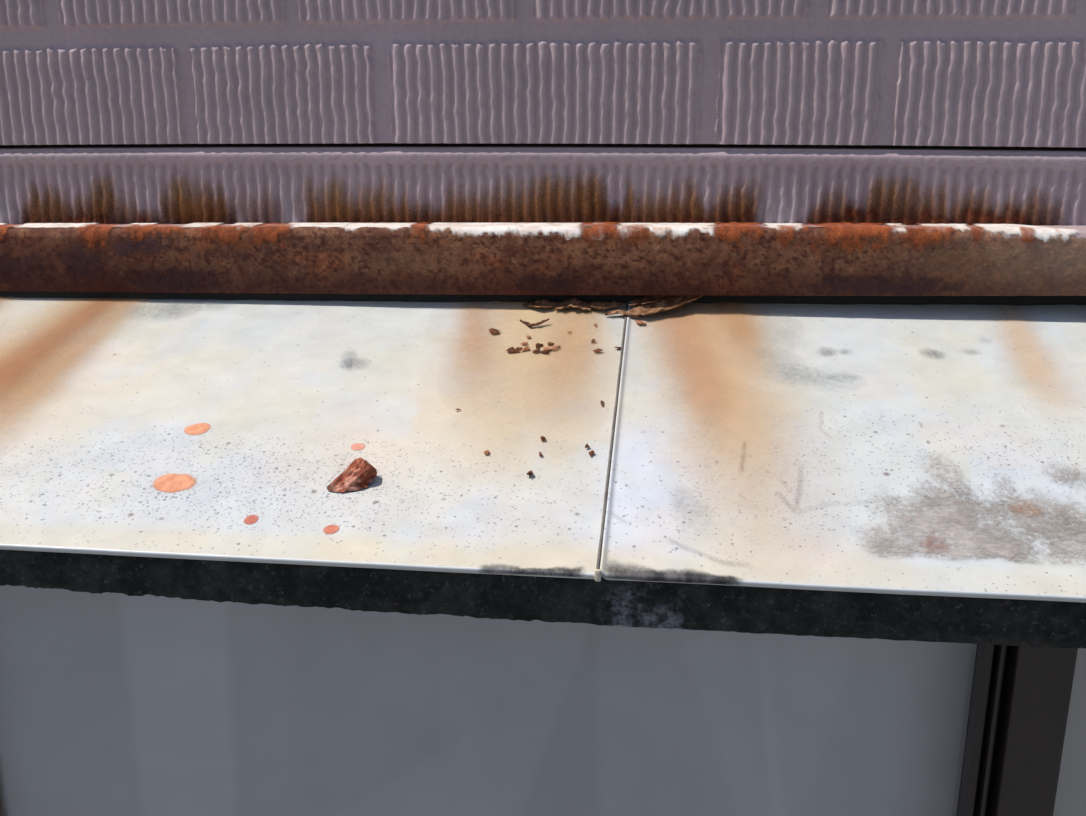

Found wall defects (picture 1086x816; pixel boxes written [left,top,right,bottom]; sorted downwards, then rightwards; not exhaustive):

rust [0,182,1086,469]
rust [154,474,195,492]
rust [327,443,377,492]
rust [324,525,339,534]